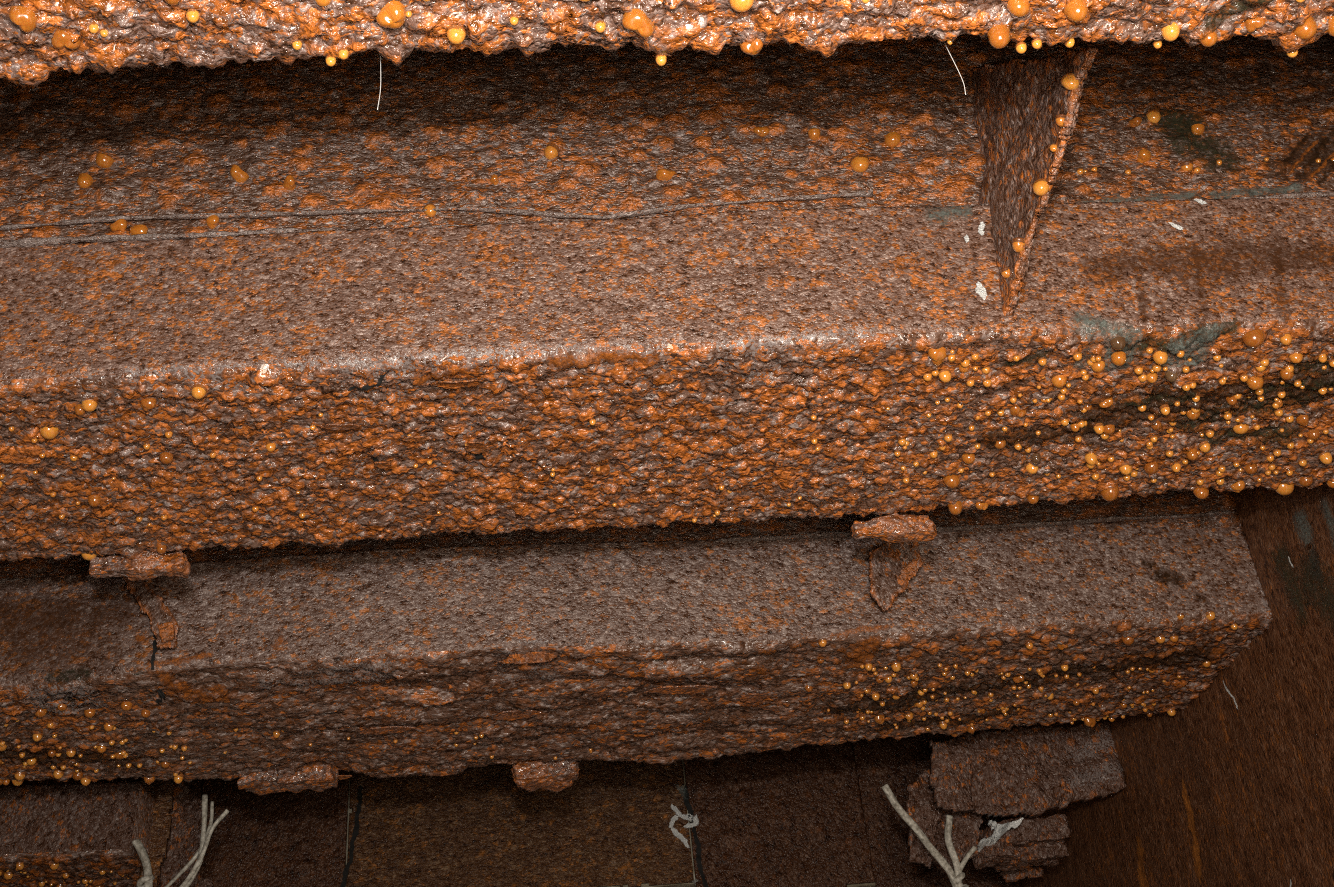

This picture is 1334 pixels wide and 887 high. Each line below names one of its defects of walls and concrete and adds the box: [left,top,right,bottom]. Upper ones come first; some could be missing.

corrosion [1086,242,1334,324]
corrosion [549,343,659,368]
corrosion [897,558,917,586]
corrosion [147,653,229,704]
corrosion [499,651,557,665]
corrosion [1182,780,1201,884]